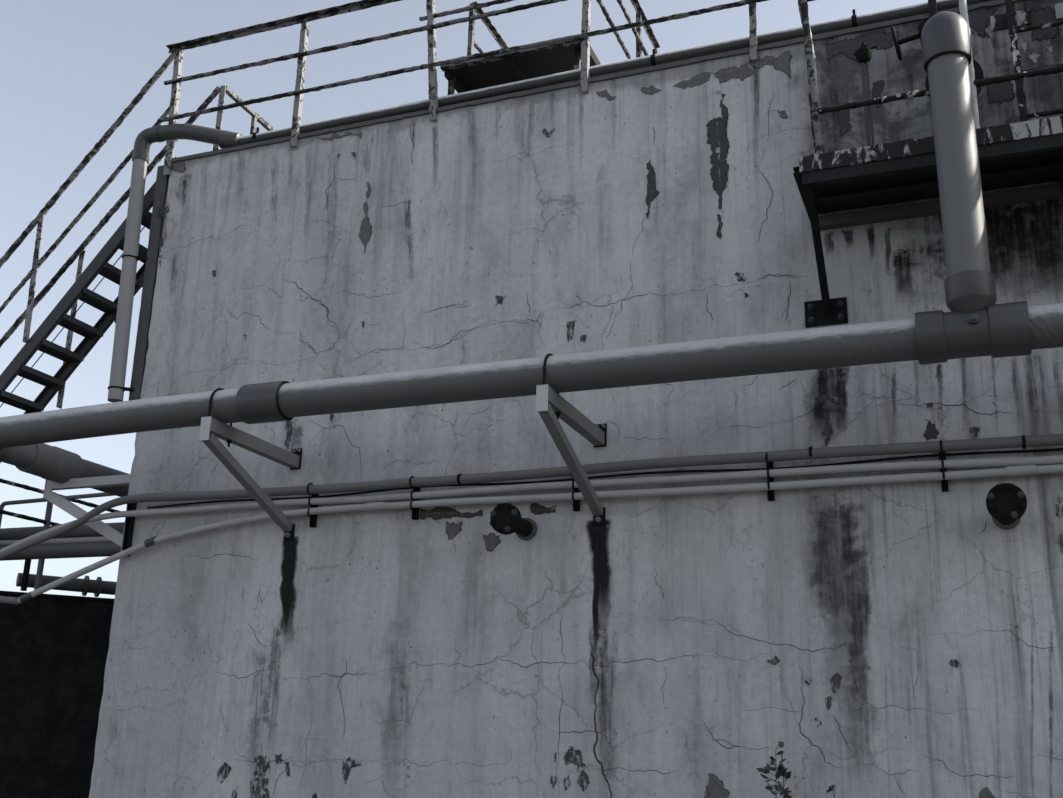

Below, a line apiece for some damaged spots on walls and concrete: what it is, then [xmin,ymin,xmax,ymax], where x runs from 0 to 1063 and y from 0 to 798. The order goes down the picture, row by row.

peeling [640,50,792,239]
crack [756,86,778,242]
peeling [358,182,372,253]
crack [178,217,804,379]
crack [210,565,1059,798]
spalling [217,762,232,783]
spalling [232,753,291,798]
spalling [550,746,589,793]
peeling [704,773,730,798]
peeling [979,787,996,798]